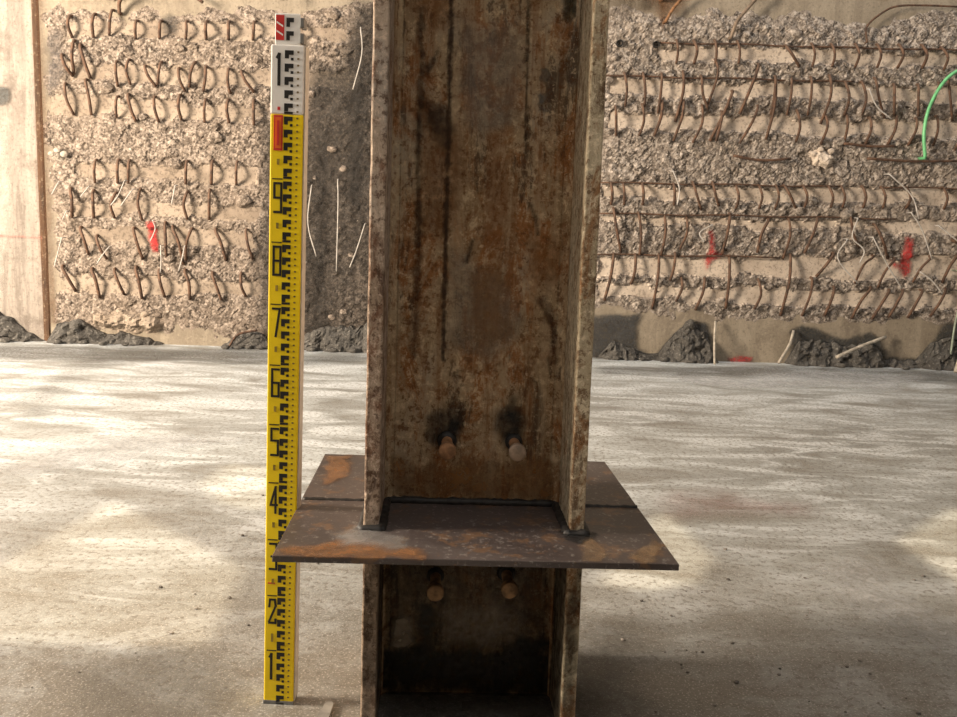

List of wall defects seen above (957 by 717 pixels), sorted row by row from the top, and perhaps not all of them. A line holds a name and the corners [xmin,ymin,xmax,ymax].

spalling [40,0,289,346]
spalling [302,0,373,334]
rust [416,0,453,361]
rust [563,0,576,20]
spalling [595,0,957,326]